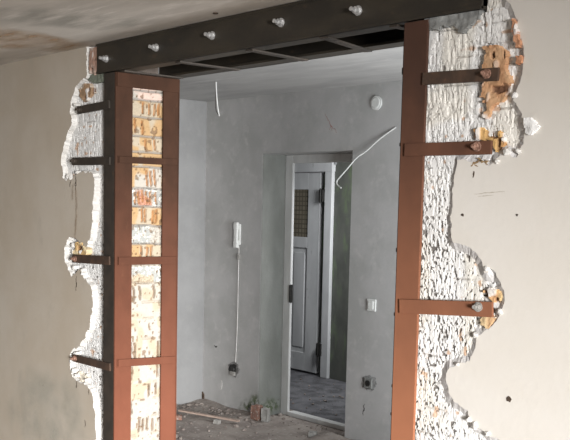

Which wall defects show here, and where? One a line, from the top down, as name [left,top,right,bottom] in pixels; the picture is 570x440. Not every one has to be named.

flaking render [424,0,541,167]
flaking render [66,46,104,440]
flaking render [415,155,503,440]